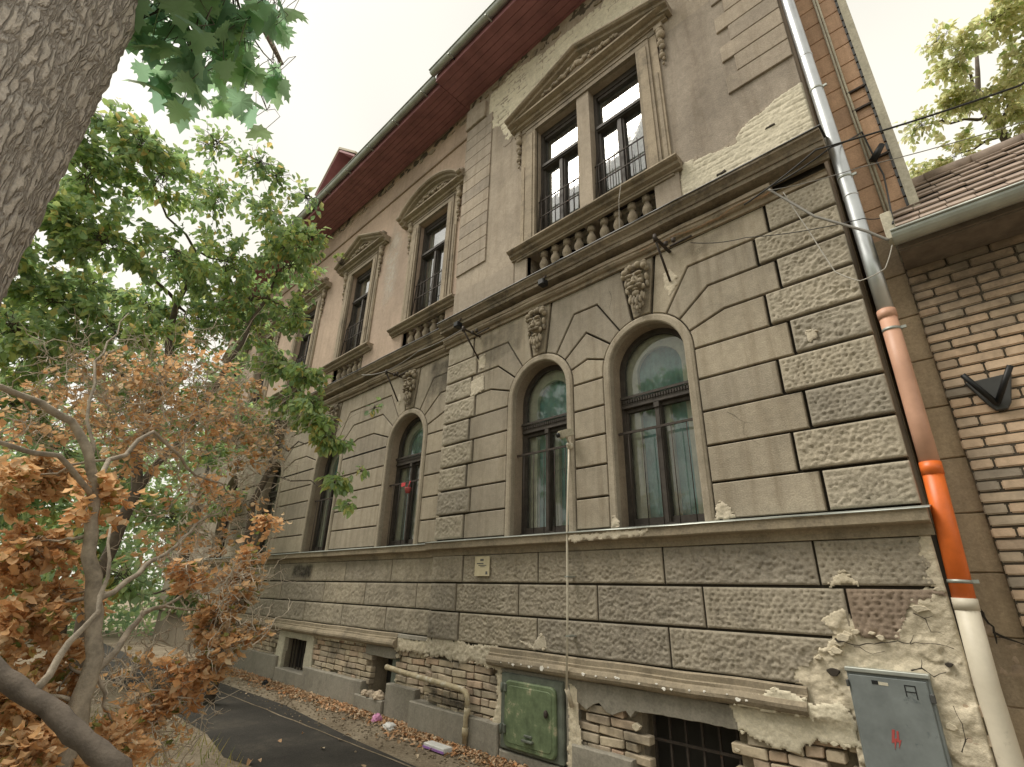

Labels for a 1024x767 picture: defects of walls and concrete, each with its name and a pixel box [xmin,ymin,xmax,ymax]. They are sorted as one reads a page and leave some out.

peeling [489,0,646,147]
peeling [680,82,815,196]
flaking render [394,637,502,723]
spalling [729,535,998,767]
crack [835,612,954,677]
crack [980,608,1024,645]
flaking render [566,684,656,767]